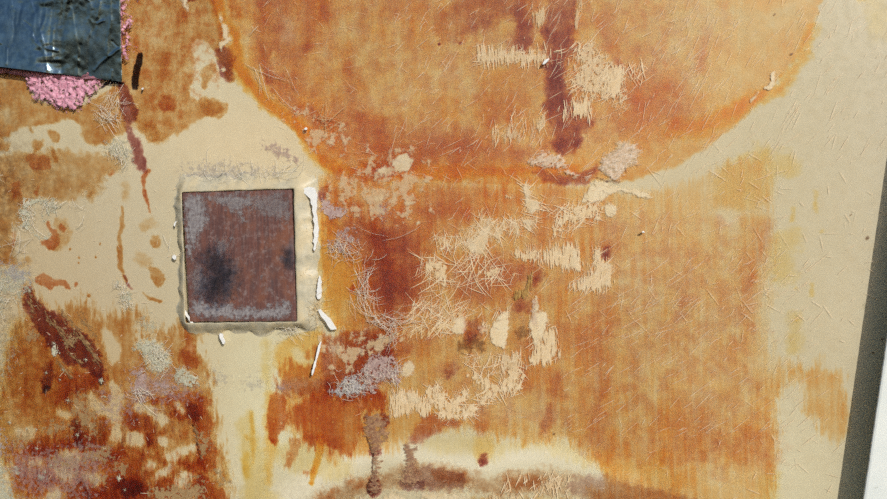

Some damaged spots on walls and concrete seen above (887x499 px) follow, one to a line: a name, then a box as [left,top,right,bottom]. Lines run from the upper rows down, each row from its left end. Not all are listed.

spalling [527,142,641,184]
peeling [304,187,319,251]
peeling [316,275,337,330]